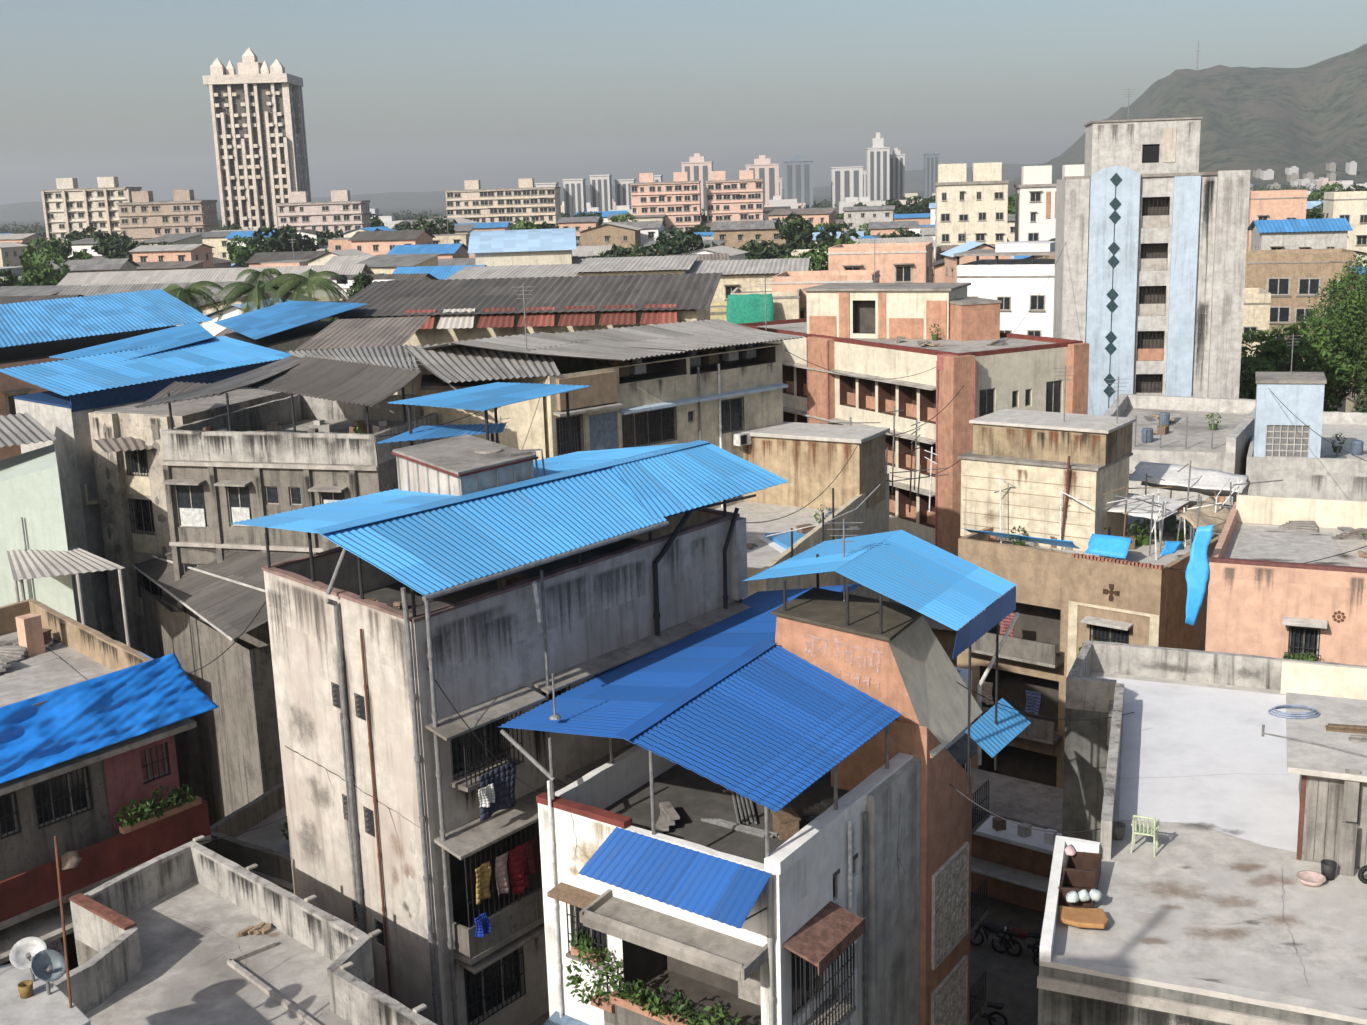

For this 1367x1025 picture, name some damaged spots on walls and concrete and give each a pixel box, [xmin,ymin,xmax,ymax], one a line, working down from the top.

damp [1204,181,1214,268]
damp [1196,304,1207,373]
damp [269,586,323,629]
damp [369,611,409,675]
damp [337,659,356,778]
damp [231,872,280,913]
damp [306,913,353,945]
damp [1067,996,1209,1025]